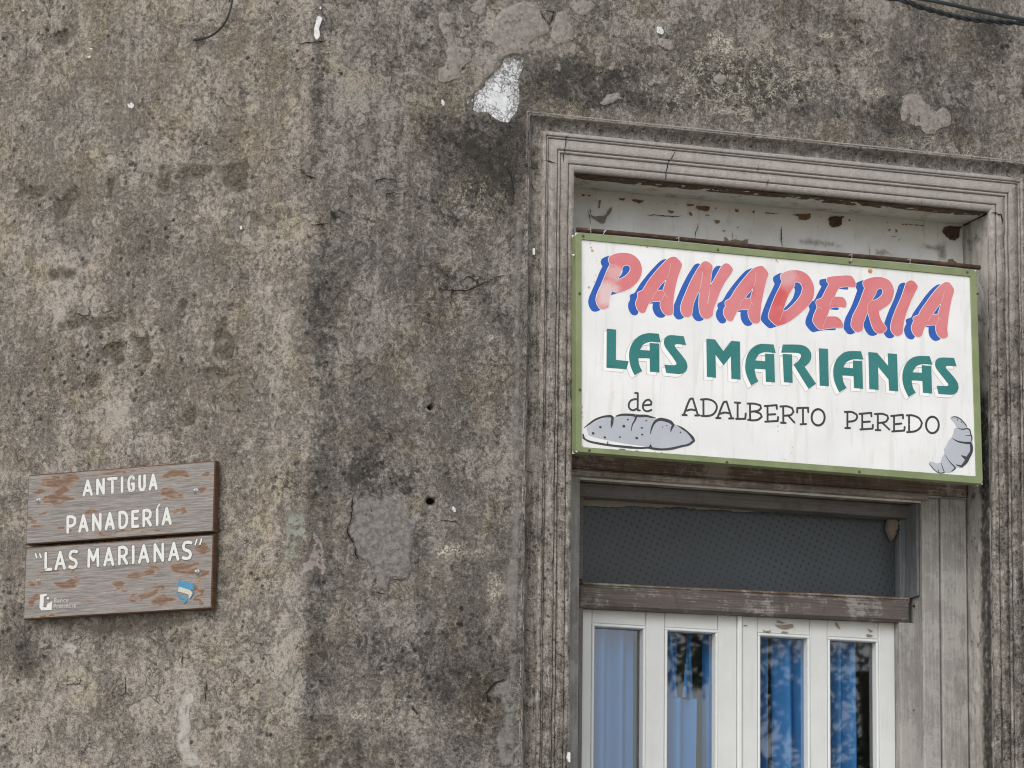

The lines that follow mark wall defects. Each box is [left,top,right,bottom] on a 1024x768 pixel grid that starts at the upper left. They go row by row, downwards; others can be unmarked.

peeling [438,12,472,83]
peeling [467,0,595,122]
peeling [900,93,951,135]
flaking render [574,174,987,240]
crack [435,275,505,306]